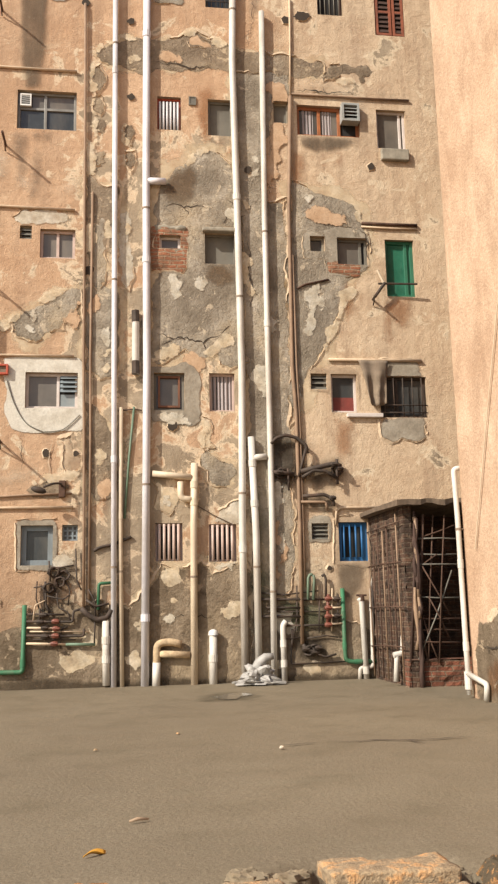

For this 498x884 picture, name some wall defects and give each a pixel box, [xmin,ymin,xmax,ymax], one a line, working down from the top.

damp [23,0,45,84]
damp [167,168,194,200]
spalling [0,18,376,689]
crack [164,325,231,349]
spalling [475,608,498,704]